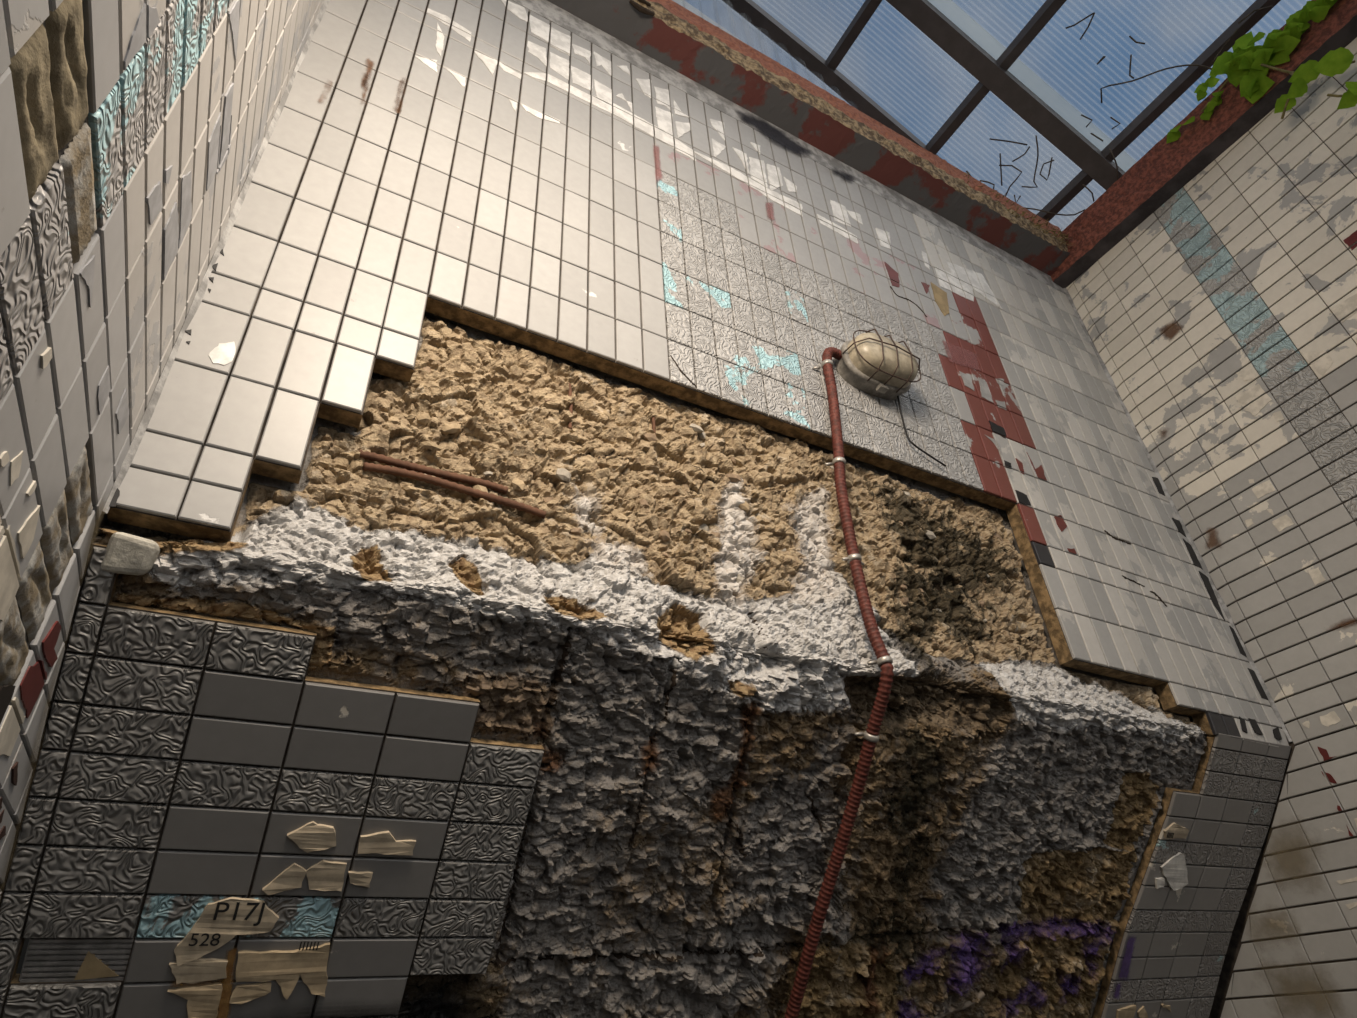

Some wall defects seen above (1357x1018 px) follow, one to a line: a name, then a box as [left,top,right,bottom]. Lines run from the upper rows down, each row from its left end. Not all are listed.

spalling [0,318,1195,786]
damp [863,474,1020,681]
crack [490,627,573,750]
crack [628,658,679,847]
crack [721,699,752,859]
peeling [19,937,134,983]
crack [488,792,1111,968]
spalling [776,931,904,1018]
spalling [989,771,1160,1018]